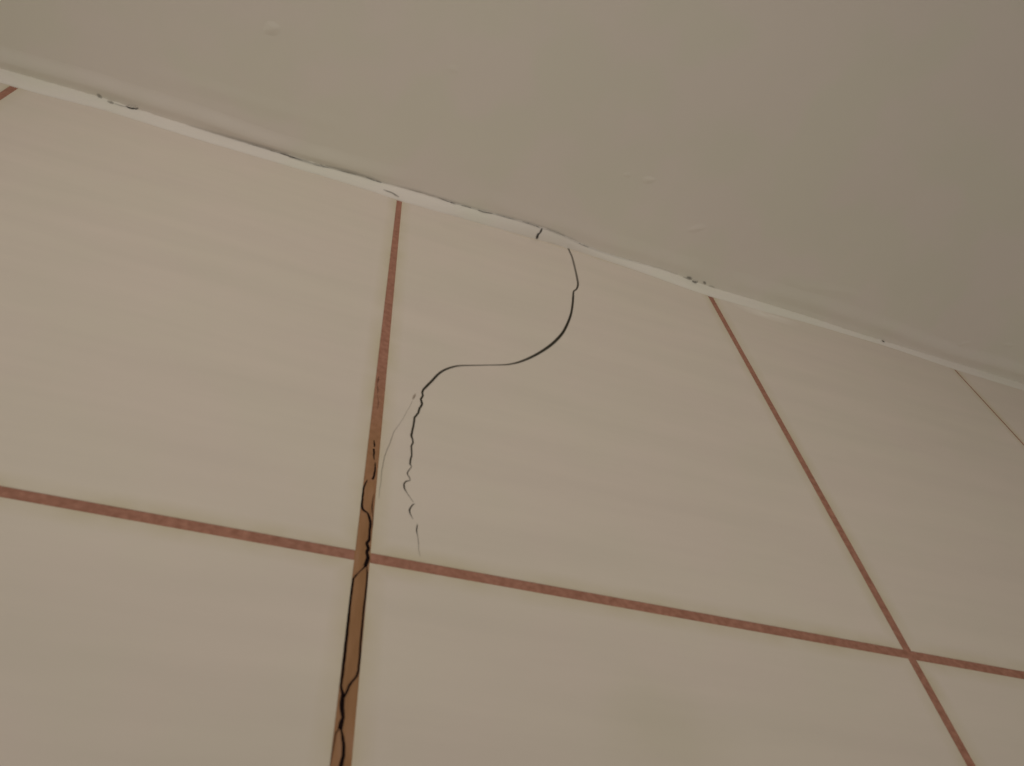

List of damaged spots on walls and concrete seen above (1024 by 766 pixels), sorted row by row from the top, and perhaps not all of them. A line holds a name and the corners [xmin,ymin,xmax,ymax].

crack [502,268,579,365]
crack [403,365,471,547]
crack [332,441,376,766]